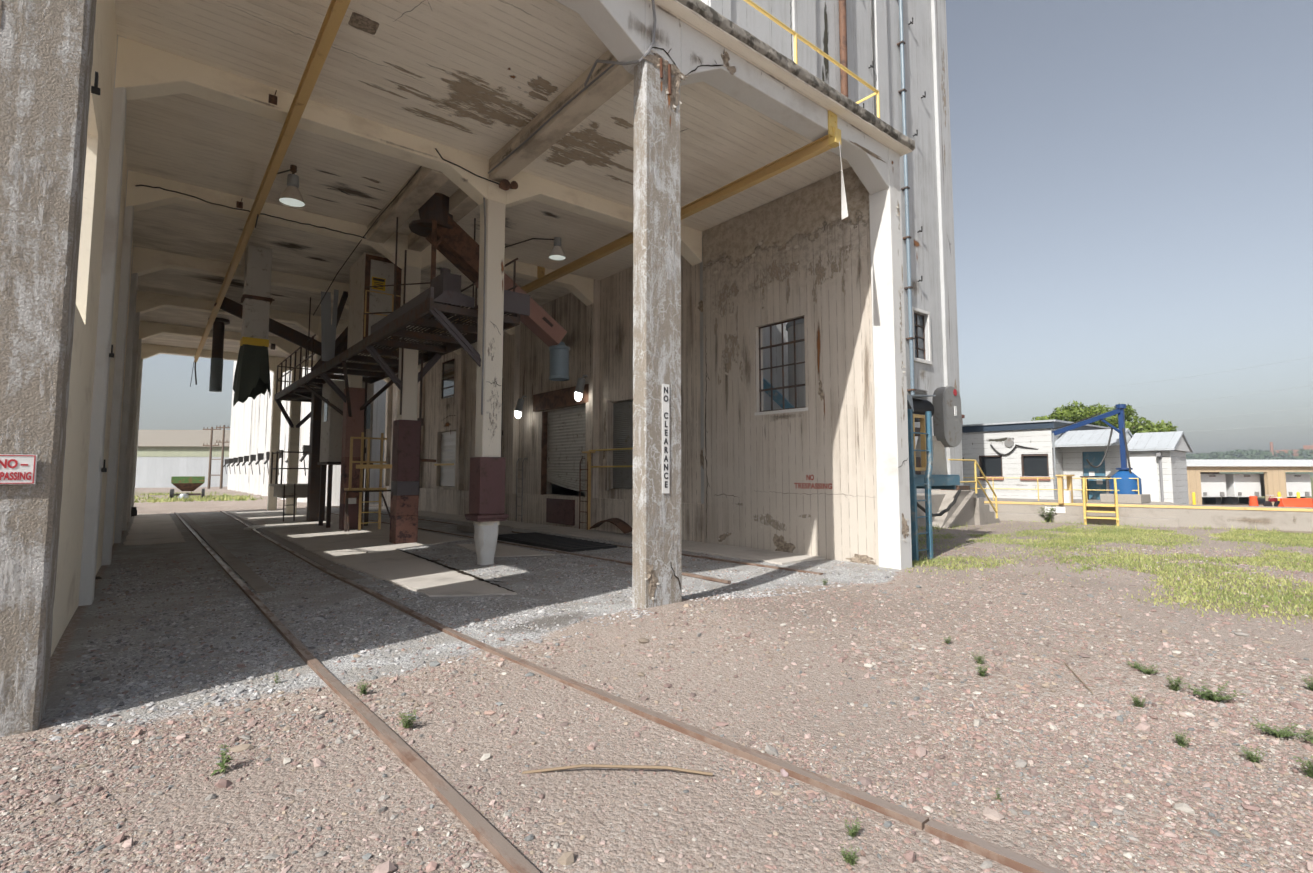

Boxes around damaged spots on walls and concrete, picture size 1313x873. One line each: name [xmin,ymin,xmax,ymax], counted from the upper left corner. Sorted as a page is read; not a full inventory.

peeling [360,62,558,134]
peeling [545,117,658,185]
spalling [754,514,796,553]